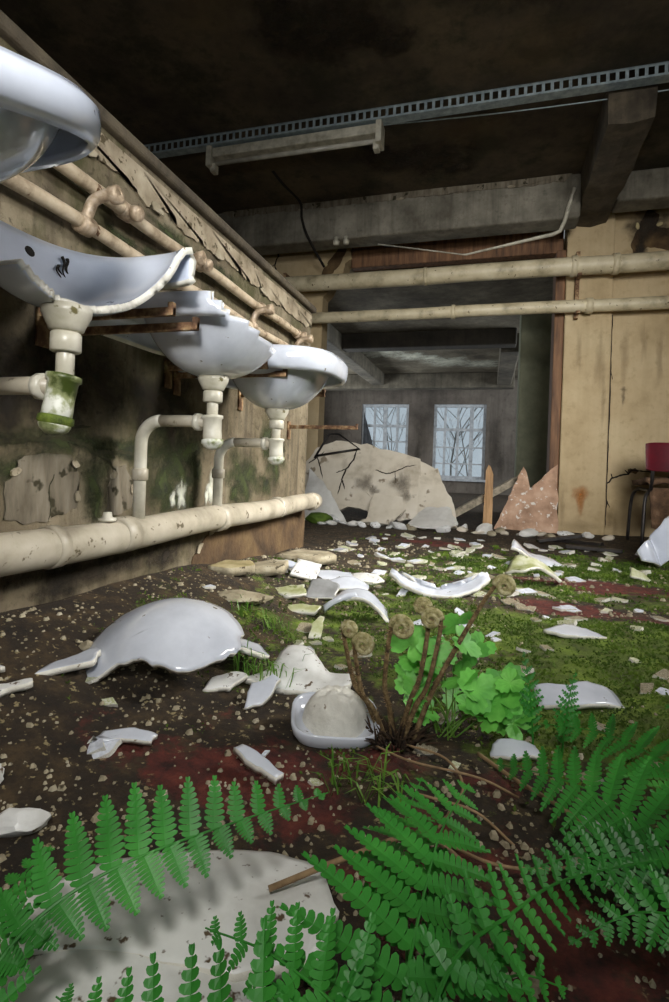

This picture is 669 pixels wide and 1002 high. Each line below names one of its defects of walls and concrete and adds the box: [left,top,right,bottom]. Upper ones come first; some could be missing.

peeling [88,133,312,328]
spalling [631,210,669,253]
peeling [3,452,81,525]